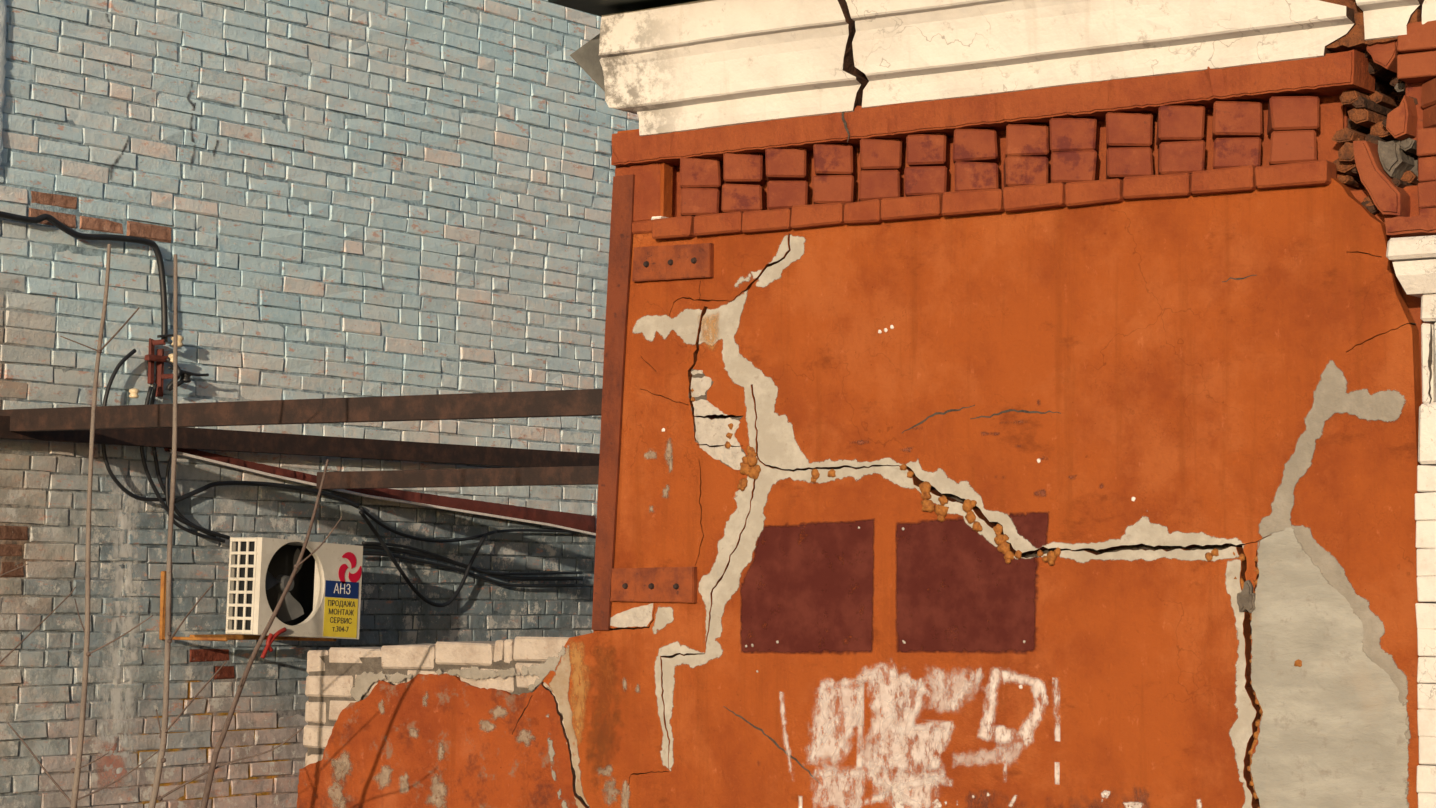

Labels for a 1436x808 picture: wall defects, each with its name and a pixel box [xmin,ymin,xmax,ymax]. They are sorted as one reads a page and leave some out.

spalling [689,369,747,470]
peeling [644,441,673,511]
crack [612,234,1260,808]
spalling [1237,580,1256,613]
peeling [479,706,507,732]
peeling [517,730,534,745]
crack [512,681,589,808]
peeling [328,752,352,808]
peeling [375,766,409,793]
peeling [428,743,447,808]
peeling [1101,790,1142,808]